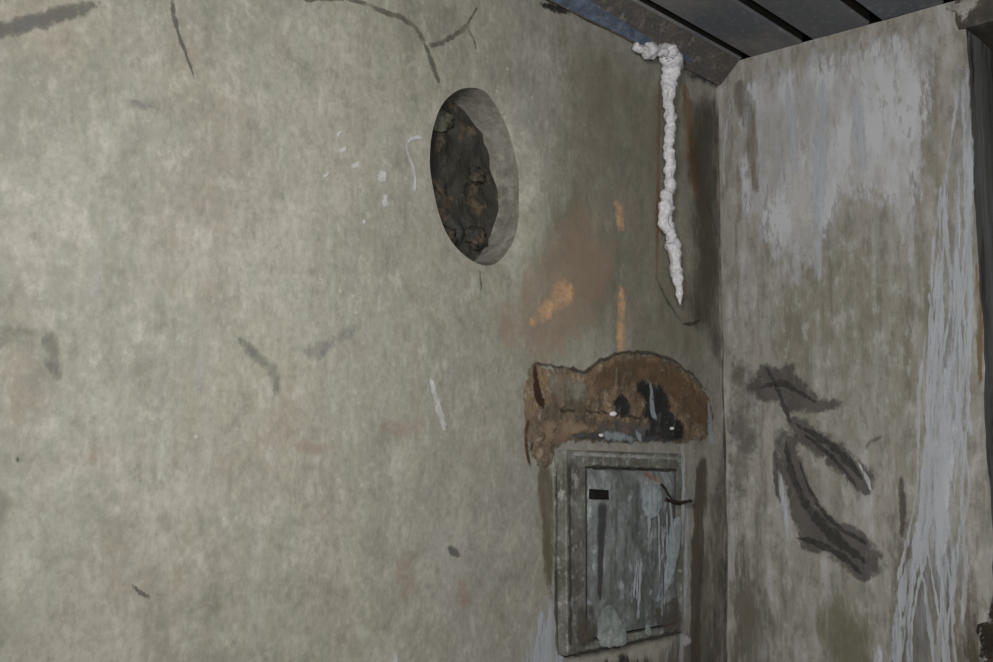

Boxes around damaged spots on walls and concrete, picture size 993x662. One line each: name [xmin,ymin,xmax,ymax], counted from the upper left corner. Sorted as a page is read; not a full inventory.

crack [171,3,193,74]
crack [305,0,477,82]
peeling [552,0,654,45]
leakage [946,0,979,22]
leakage [692,34,932,324]
corrosion [617,287,625,351]
leakage [891,70,978,662]
spalling [524,350,714,585]
leakage [665,419,727,662]
leakage [779,475,789,542]
leakage [526,561,563,662]